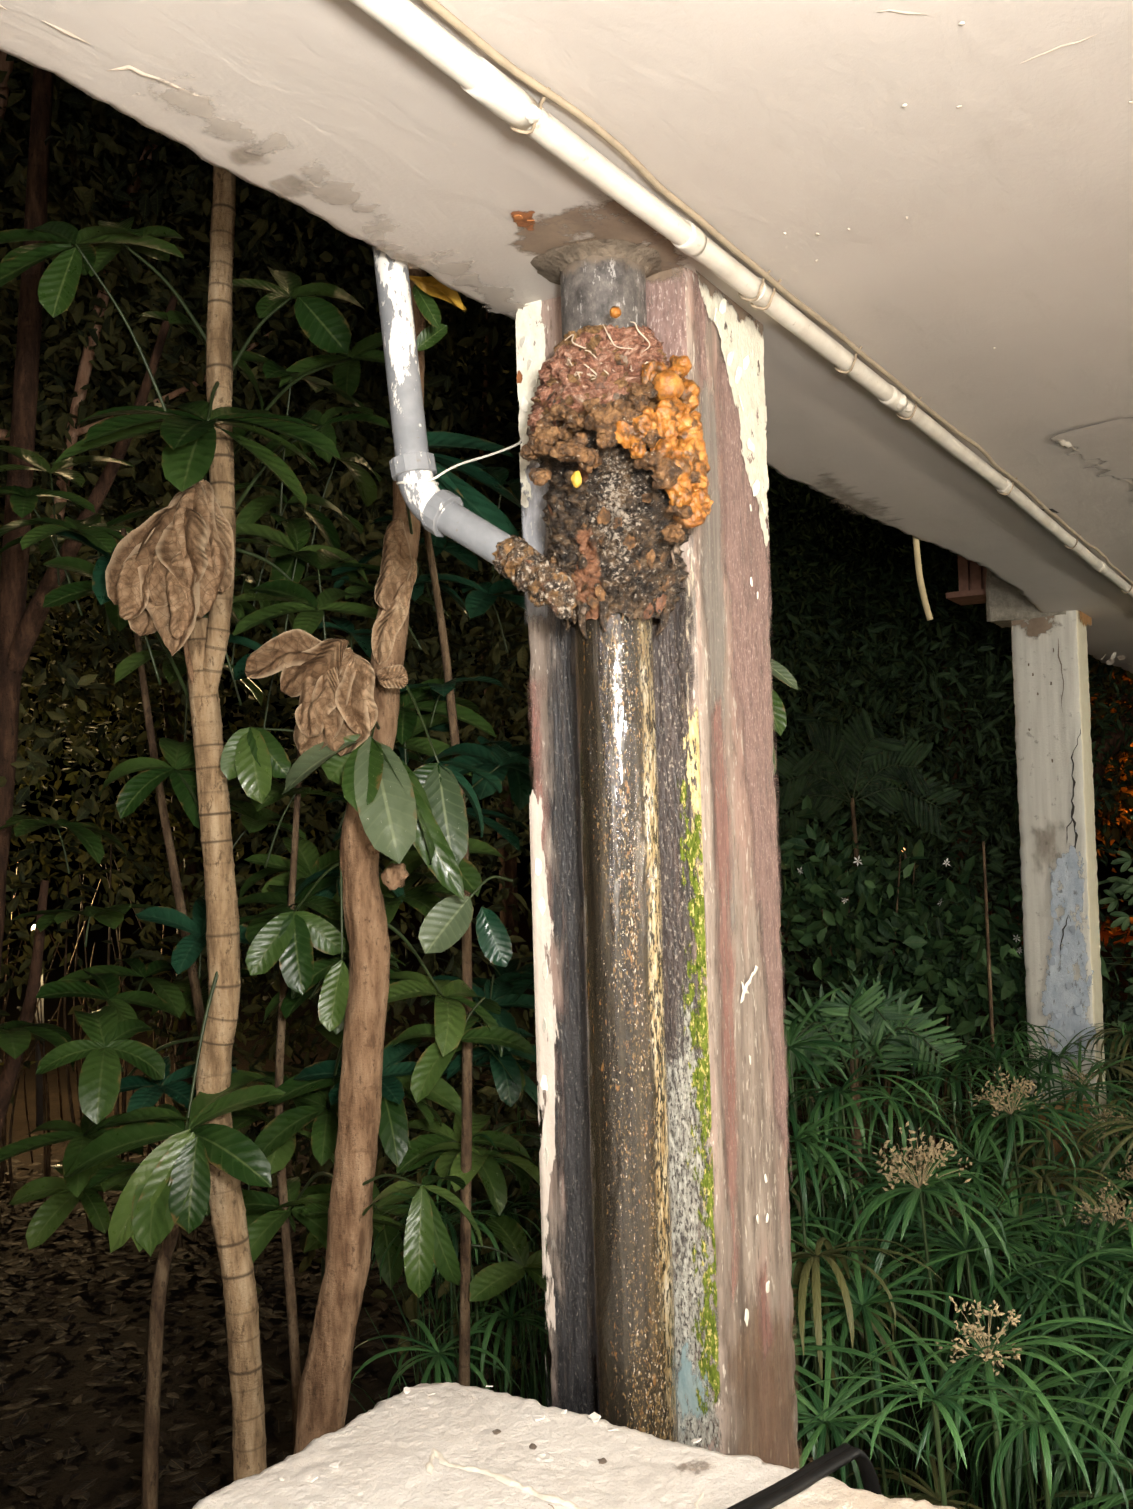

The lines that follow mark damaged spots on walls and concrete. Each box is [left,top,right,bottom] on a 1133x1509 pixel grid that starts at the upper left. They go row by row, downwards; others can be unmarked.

rust [511,211,536,231]
leakage [510,201,763,336]
peeling [1051,418,1133,491]
peeling [646,274,789,1156]
crack [1058,640,1081,849]
leakage [653,385,738,1451]
crack [425,1448,587,1509]